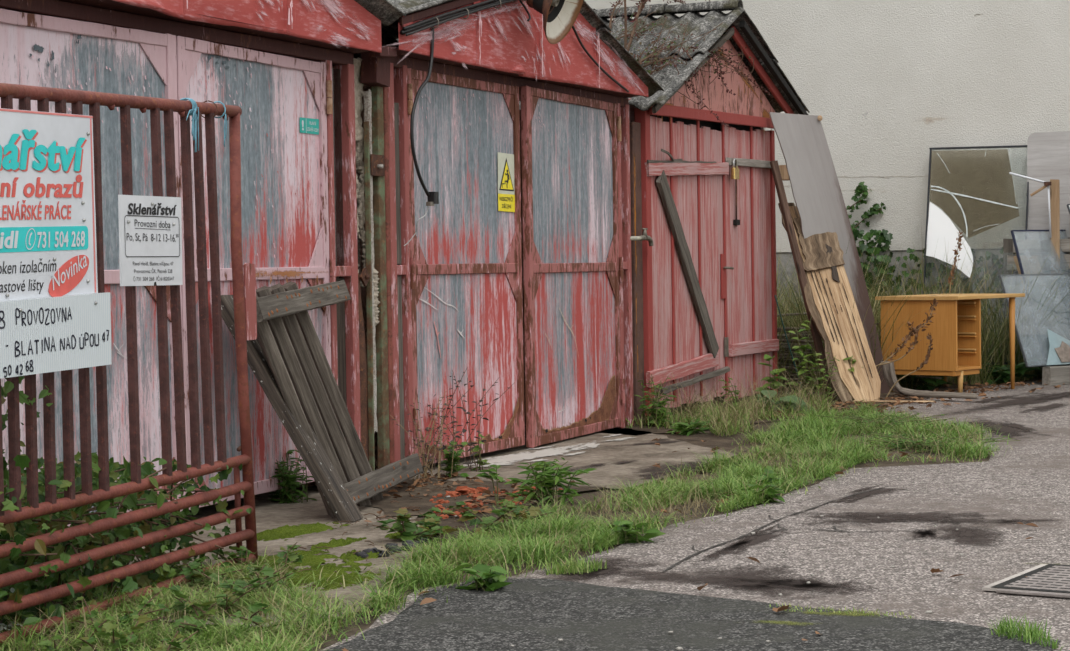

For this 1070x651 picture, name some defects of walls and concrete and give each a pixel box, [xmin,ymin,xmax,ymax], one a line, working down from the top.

peeling [30,44,57,88]
peeling [199,54,252,130]
peeling [258,0,370,45]
peeling [392,3,569,79]
peeling [575,22,642,91]